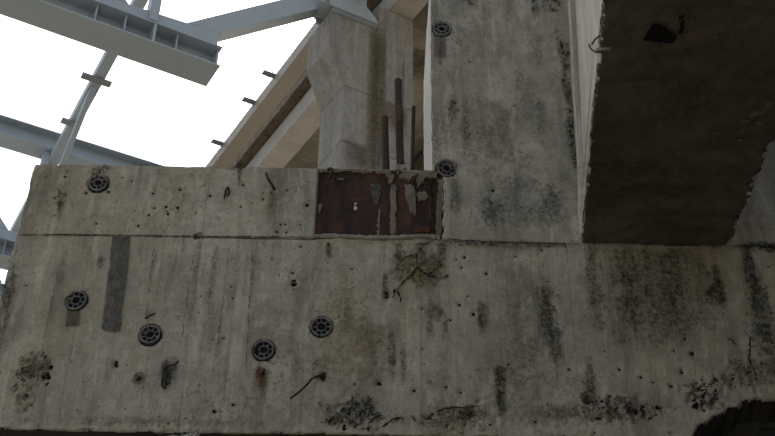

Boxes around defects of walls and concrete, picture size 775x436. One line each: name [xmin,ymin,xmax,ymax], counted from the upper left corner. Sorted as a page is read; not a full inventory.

spalling [643,15,685,44]
crack [392,238,578,302]
water stain [714,247,775,385]
peeling [16,351,53,386]
peeling [682,379,719,417]